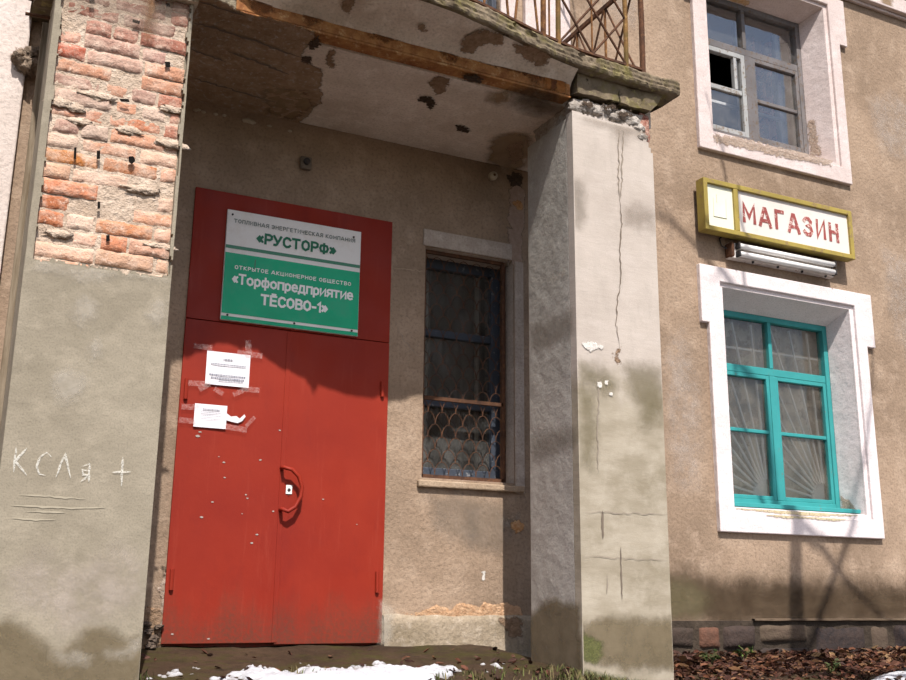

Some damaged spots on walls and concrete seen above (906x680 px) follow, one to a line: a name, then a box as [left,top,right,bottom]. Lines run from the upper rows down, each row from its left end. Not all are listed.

corrosion [249,0,273,15]
peeling [460,29,551,66]
peeling [417,76,450,109]
peeling [462,75,484,84]
corrosion [479,61,566,94]
flaking render [33,0,336,277]
spalling [533,98,650,143]
peeling [713,120,833,166]
crack [597,130,624,468]
flaking render [403,602,523,638]
leakage [531,577,906,680]